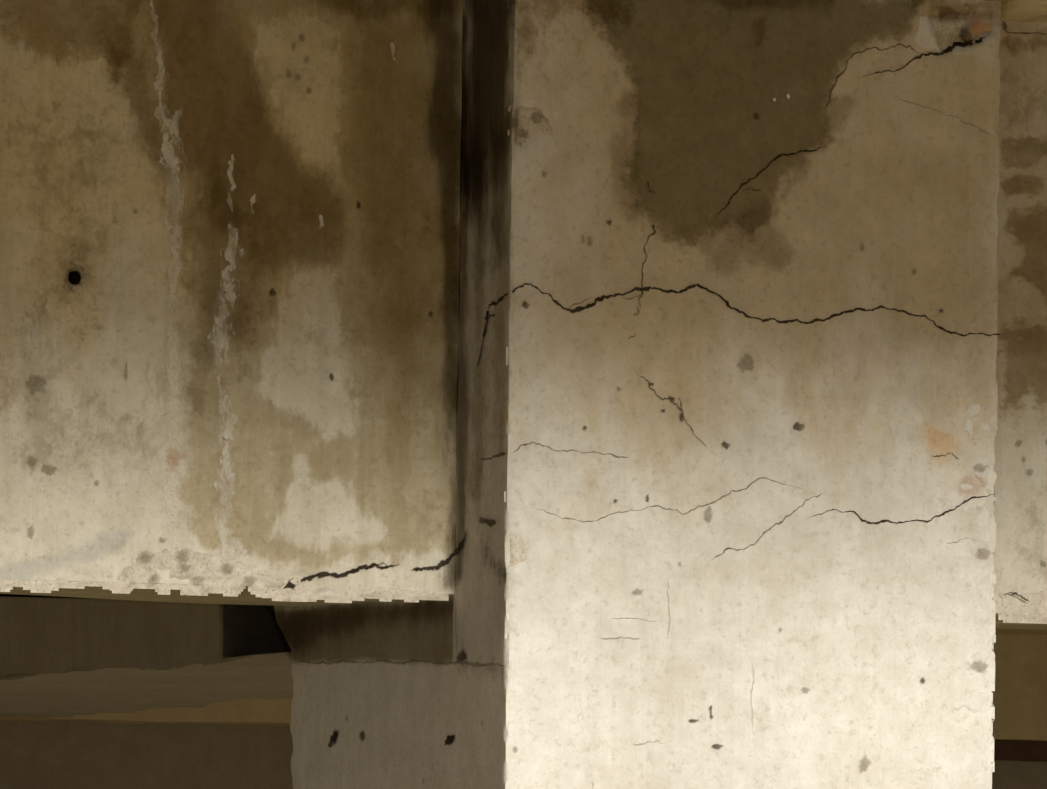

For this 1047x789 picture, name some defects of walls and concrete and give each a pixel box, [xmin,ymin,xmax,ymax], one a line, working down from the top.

crack [826,22,1047,107]
damp [159,120,182,171]
crack [717,143,828,215]
damp [208,236,238,347]
crack [477,225,1000,365]
crack [645,379,713,453]
crack [531,477,997,560]
crack [284,532,466,589]